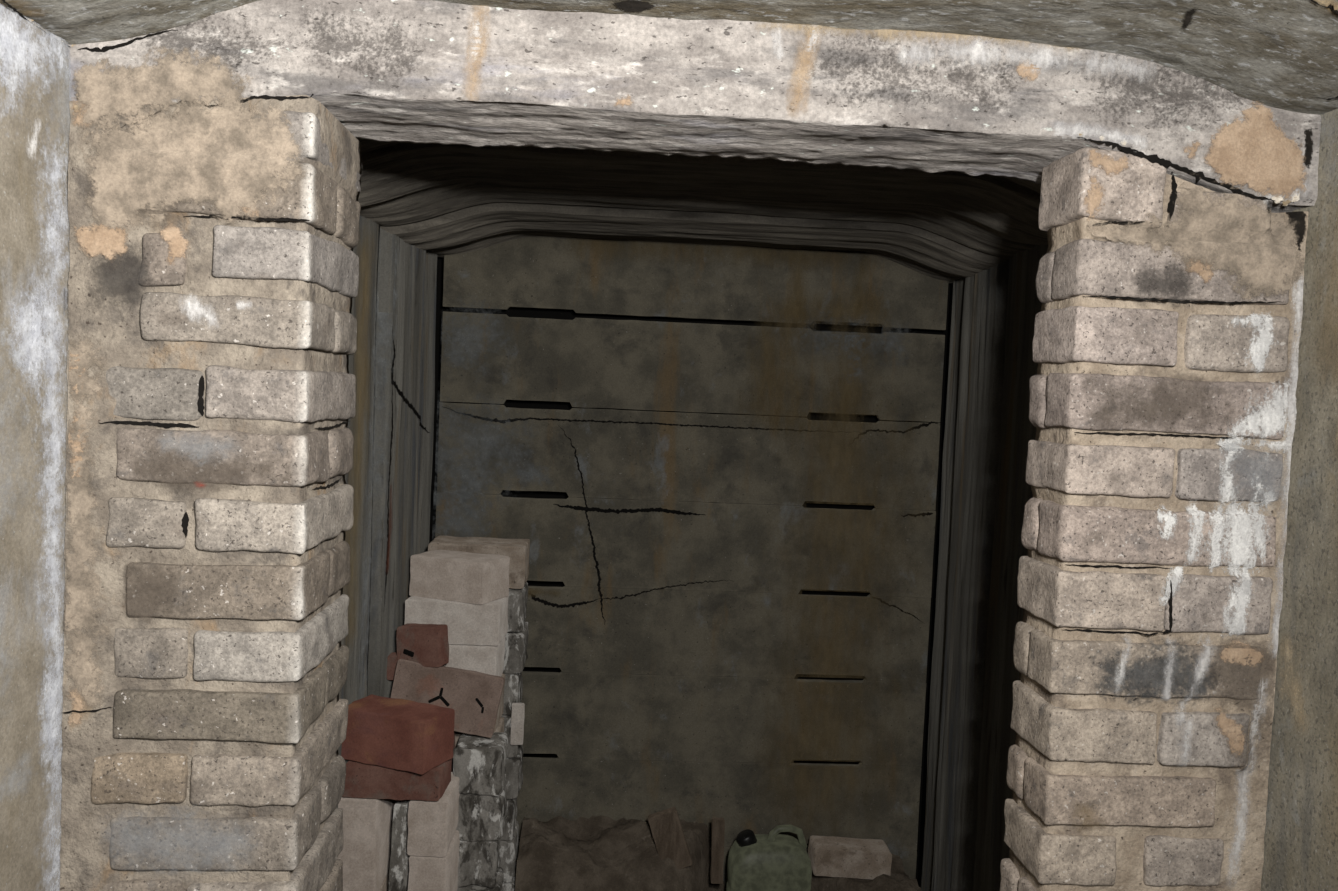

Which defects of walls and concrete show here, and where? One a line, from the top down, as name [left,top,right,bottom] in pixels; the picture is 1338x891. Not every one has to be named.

crack [3,0,171,52]
crack [1311,0,1338,14]
crack [1078,137,1275,226]
peeling [1055,101,1313,299]
crack [98,376,205,428]
damp [11,125,68,891]
crack [181,512,189,537]
crack [384,339,938,625]
crack [1065,564,1173,636]
damp [1157,280,1304,868]